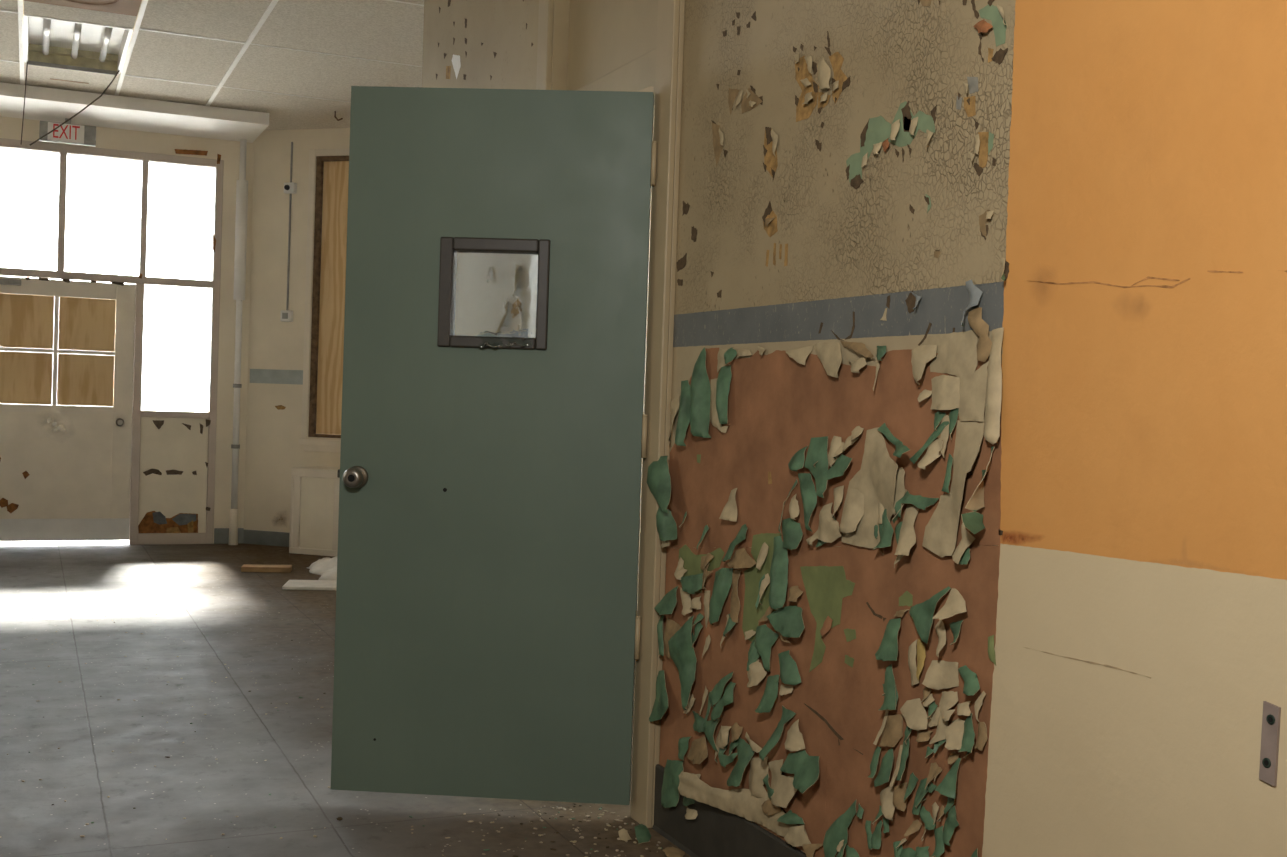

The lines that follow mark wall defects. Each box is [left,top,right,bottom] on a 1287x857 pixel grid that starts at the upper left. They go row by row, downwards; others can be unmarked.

spalling [436,19,497,80]
spalling [962,0,1008,65]
spalling [793,31,850,152]
spalling [175,149,221,164]
spalling [845,101,937,189]
spalling [956,77,996,176]
spalling [676,201,697,286]
crack [1027,270,1243,288]
spalling [143,462,208,476]
spalling [0,498,19,513]
peeling [647,279,1004,857]
crack [1024,647,1151,679]